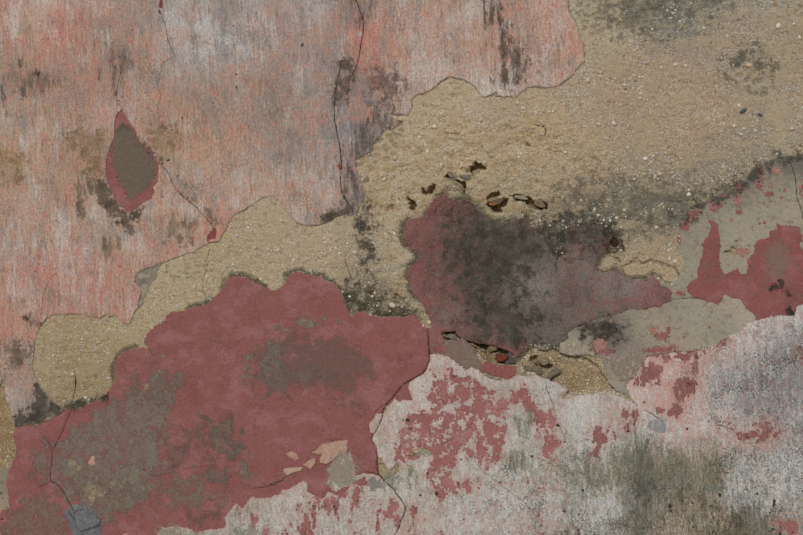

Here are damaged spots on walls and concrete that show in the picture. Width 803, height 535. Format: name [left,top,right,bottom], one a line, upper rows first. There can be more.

peeling [106,109,159,213]
crack [334,0,364,230]
peeling [686,220,803,320]
crack [40,370,76,513]
peeling [297,494,326,535]
peeling [312,440,348,464]
peeling [349,476,368,515]
peeling [375,498,401,535]
crack [369,331,430,535]
peeling [393,367,562,503]
peeling [588,426,617,457]
peeling [656,360,699,419]